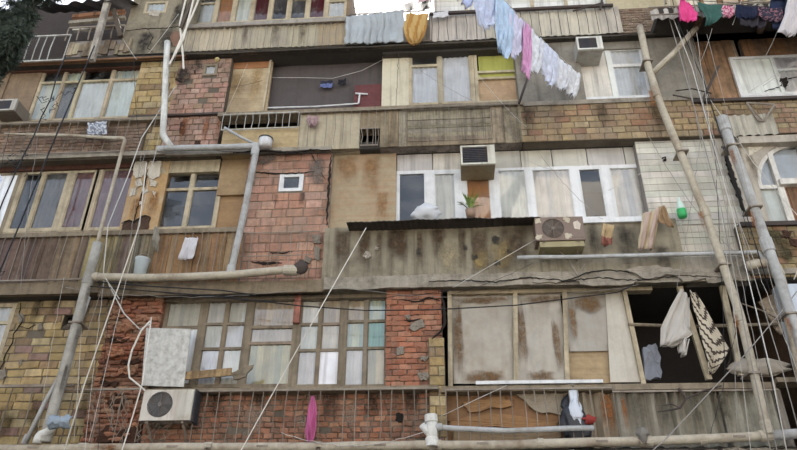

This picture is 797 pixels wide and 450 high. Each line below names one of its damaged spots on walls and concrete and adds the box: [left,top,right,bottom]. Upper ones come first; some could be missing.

leakage [138,33,151,50]
leakage [161,6,186,44]
flaking render [129,161,162,205]
flaking render [121,215,151,230]
crack [404,269,723,339]
spalling [99,310,142,413]
leakage [454,297,505,362]
leakage [468,372,501,381]
leakage [518,312,526,354]
leakage [553,325,562,362]
spalling [96,425,142,444]